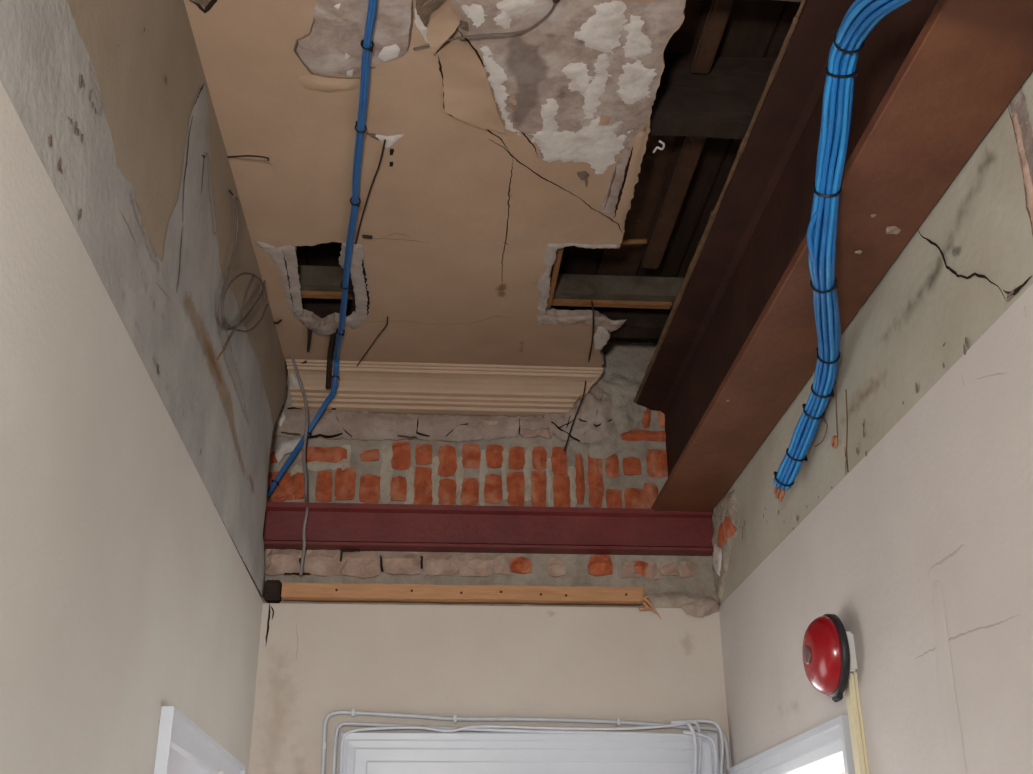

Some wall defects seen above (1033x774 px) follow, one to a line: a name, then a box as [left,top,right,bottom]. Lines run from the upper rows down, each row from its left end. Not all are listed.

crack [437,50,453,117]
crack [456,29,488,78]
crack [485,118,622,290]
peeling [0,0,685,598]
crack [918,230,1031,317]
flaking render [648,490,745,618]
crack [915,615,1017,659]